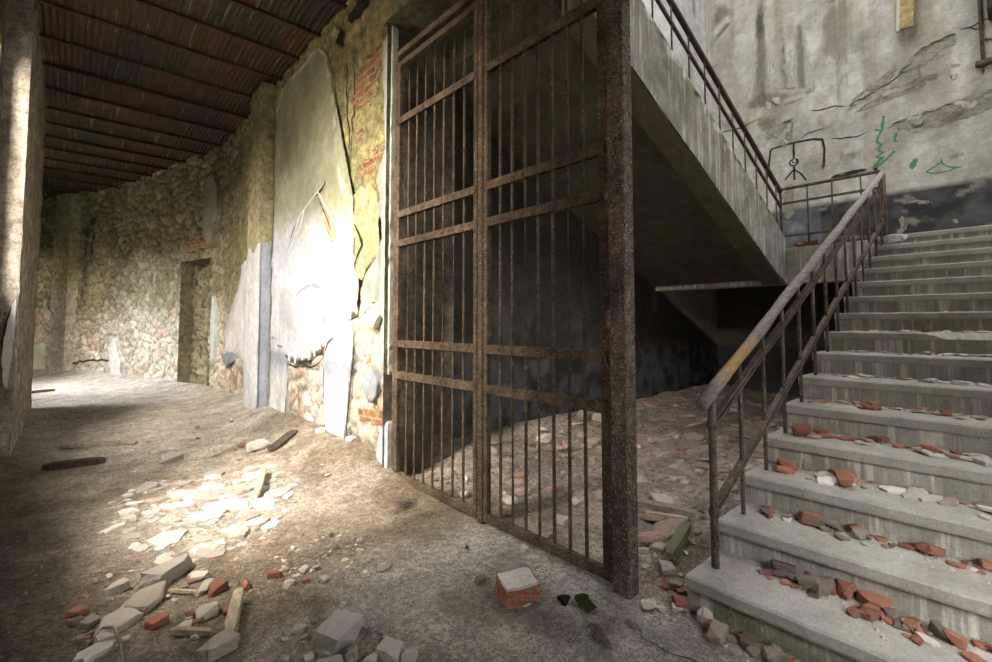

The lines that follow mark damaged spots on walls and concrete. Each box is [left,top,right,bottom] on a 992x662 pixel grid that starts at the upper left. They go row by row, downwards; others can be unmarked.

spalling [330,0,370,48]
damp [750,3,793,107]
damp [782,26,814,88]
flaking render [848,33,956,112]
crack [802,105,868,140]
flaking render [888,89,992,133]
peeling [210,25,399,469]